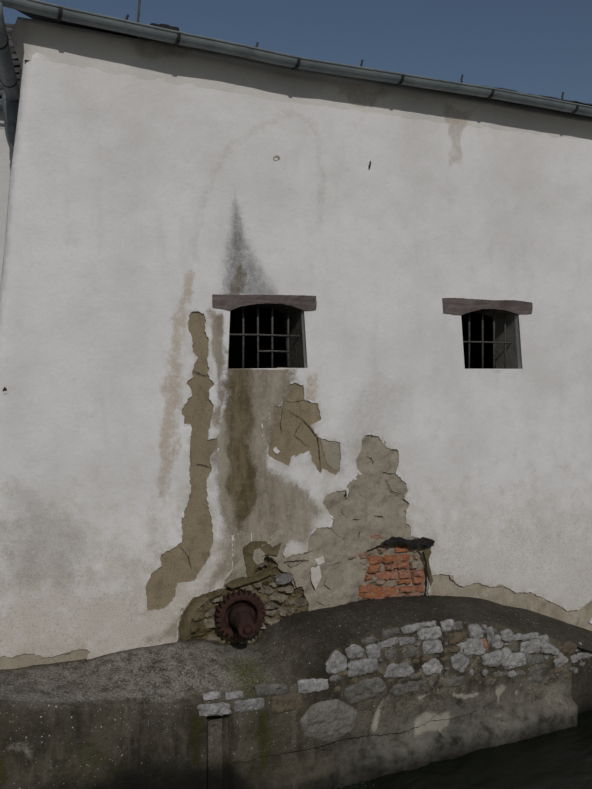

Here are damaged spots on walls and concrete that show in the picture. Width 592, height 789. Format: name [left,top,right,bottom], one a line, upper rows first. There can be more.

flaking render [146,311,219,611]
water stain [209,310,319,591]
flaking render [261,382,342,475]
flaking render [178,433,592,644]
crack [248,711,476,762]